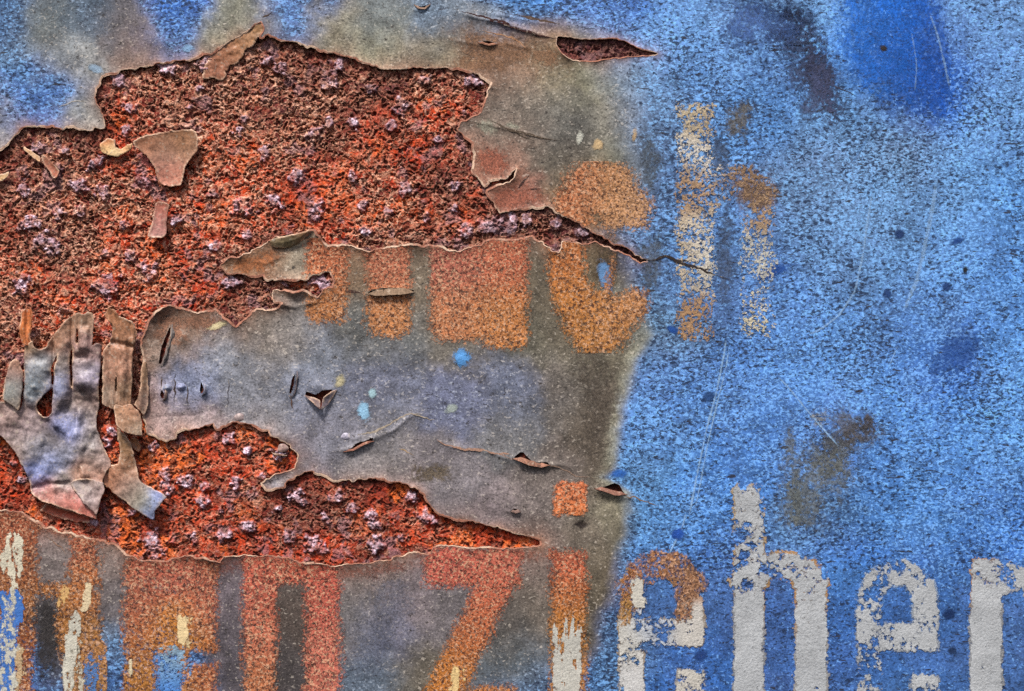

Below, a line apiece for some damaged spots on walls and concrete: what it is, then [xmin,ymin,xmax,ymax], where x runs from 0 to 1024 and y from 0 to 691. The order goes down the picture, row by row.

peeling [202,23,264,81]
rust [0,21,661,567]
crack [643,255,733,281]